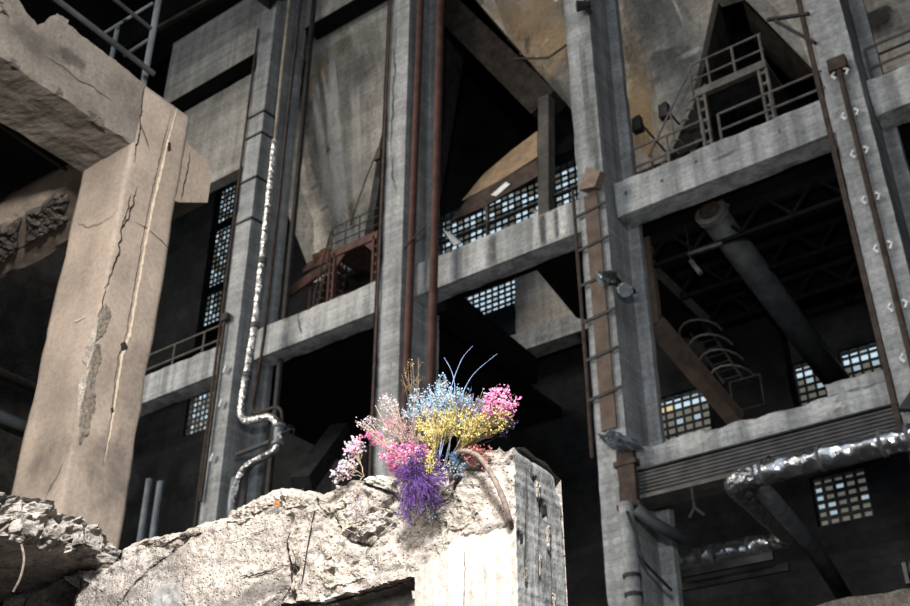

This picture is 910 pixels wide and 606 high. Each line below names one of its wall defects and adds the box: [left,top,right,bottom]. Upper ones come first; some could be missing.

crack [0,85,177,465]
spalling [78,303,111,445]
crack [335,483,398,552]
crack [117,543,186,606]
crack [219,525,415,606]